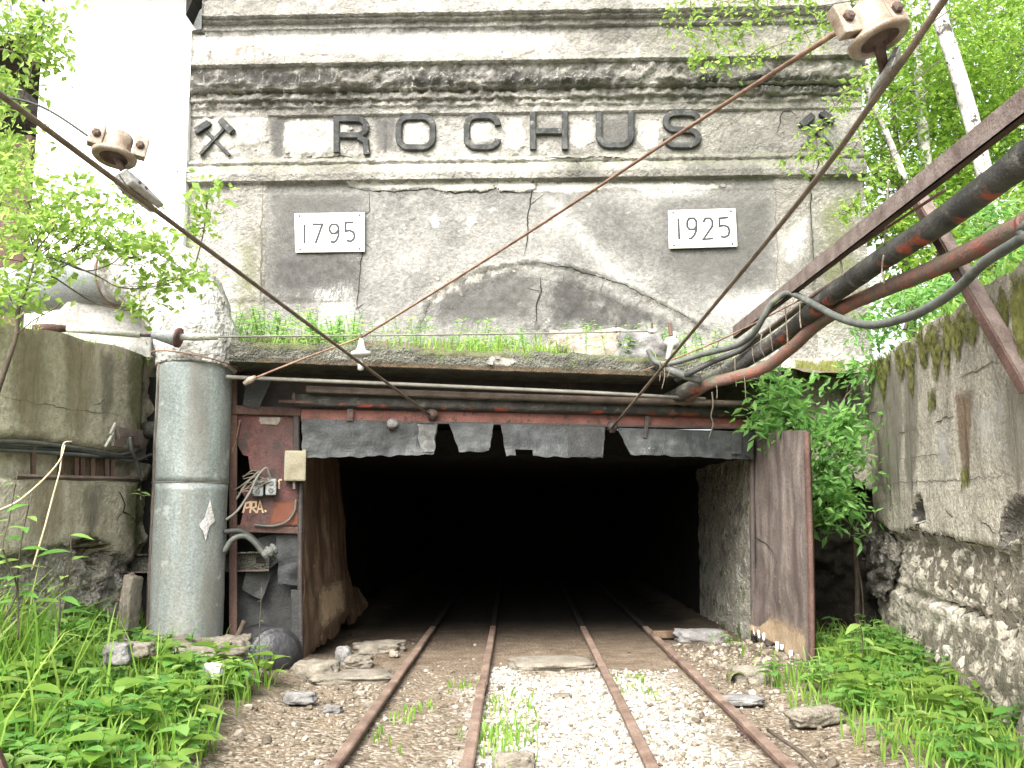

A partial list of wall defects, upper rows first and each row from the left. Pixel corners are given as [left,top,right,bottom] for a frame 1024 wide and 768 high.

crack [333,242,372,328]
crack [349,180,693,328]
crack [1,396,116,415]
rust [259,417,280,425]
rust [288,360,566,372]
damp [877,362,917,509]
damp [1006,384,1024,488]
rust [271,502,298,525]
spalling [814,492,1024,748]